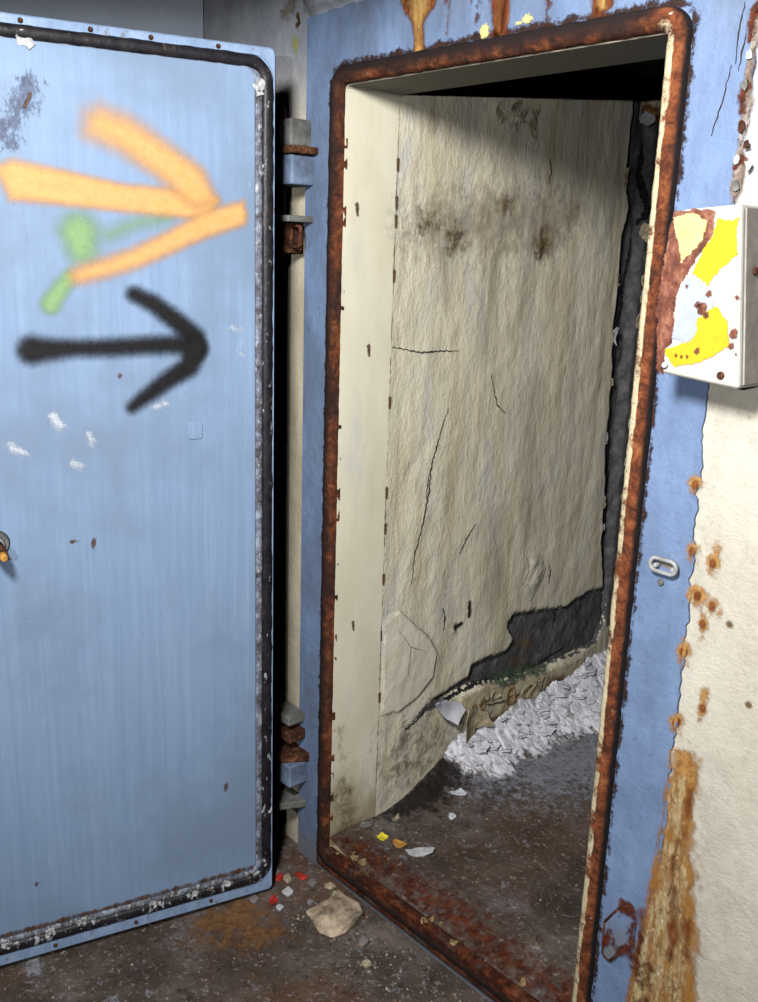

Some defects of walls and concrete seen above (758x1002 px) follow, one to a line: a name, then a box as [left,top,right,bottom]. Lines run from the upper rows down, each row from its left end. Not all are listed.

rust [329,0,700,212]
water stain [534,228,553,259]
spalling [404,84,659,743]
rust [688,476,702,493]
rust [612,370,659,799]
rust [686,584,721,638]
rust [687,542,721,575]
rust [676,639,691,666]
rust [669,713,684,731]
rust [697,688,709,722]
rust [329,809,374,878]
rust [590,748,699,1002]